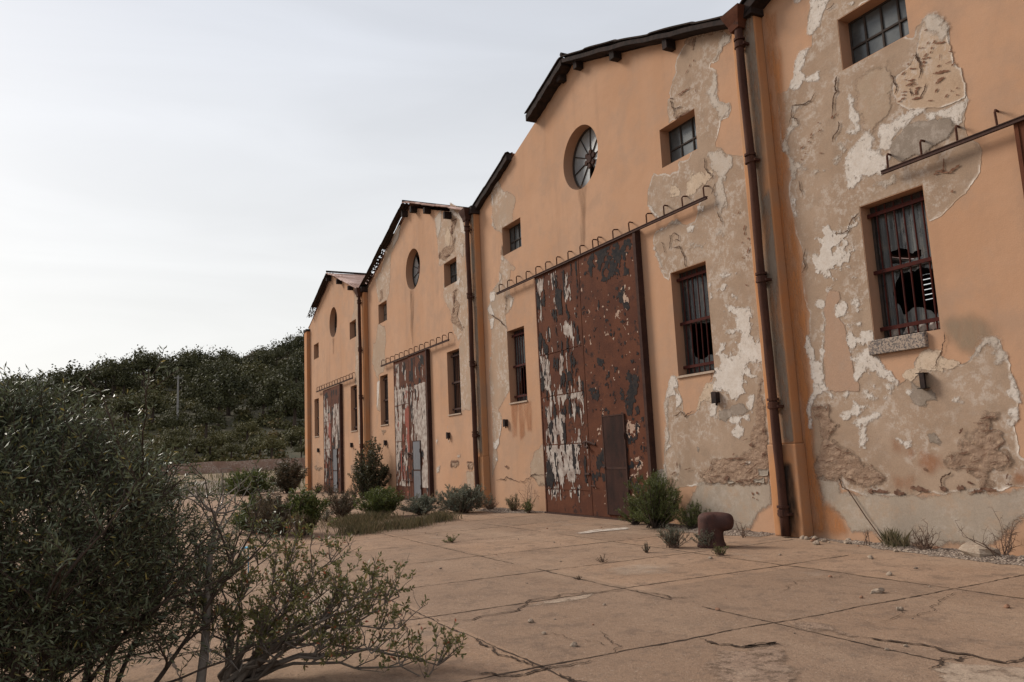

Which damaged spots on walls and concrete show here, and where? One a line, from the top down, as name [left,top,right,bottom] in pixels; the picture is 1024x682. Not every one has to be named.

peeling [435,203,471,411]
peeling [487,181,516,475]
peeling [629,30,771,530]
peeling [776,0,1024,548]
crack [395,590,684,682]
crack [699,637,782,647]
crack [858,591,1024,669]